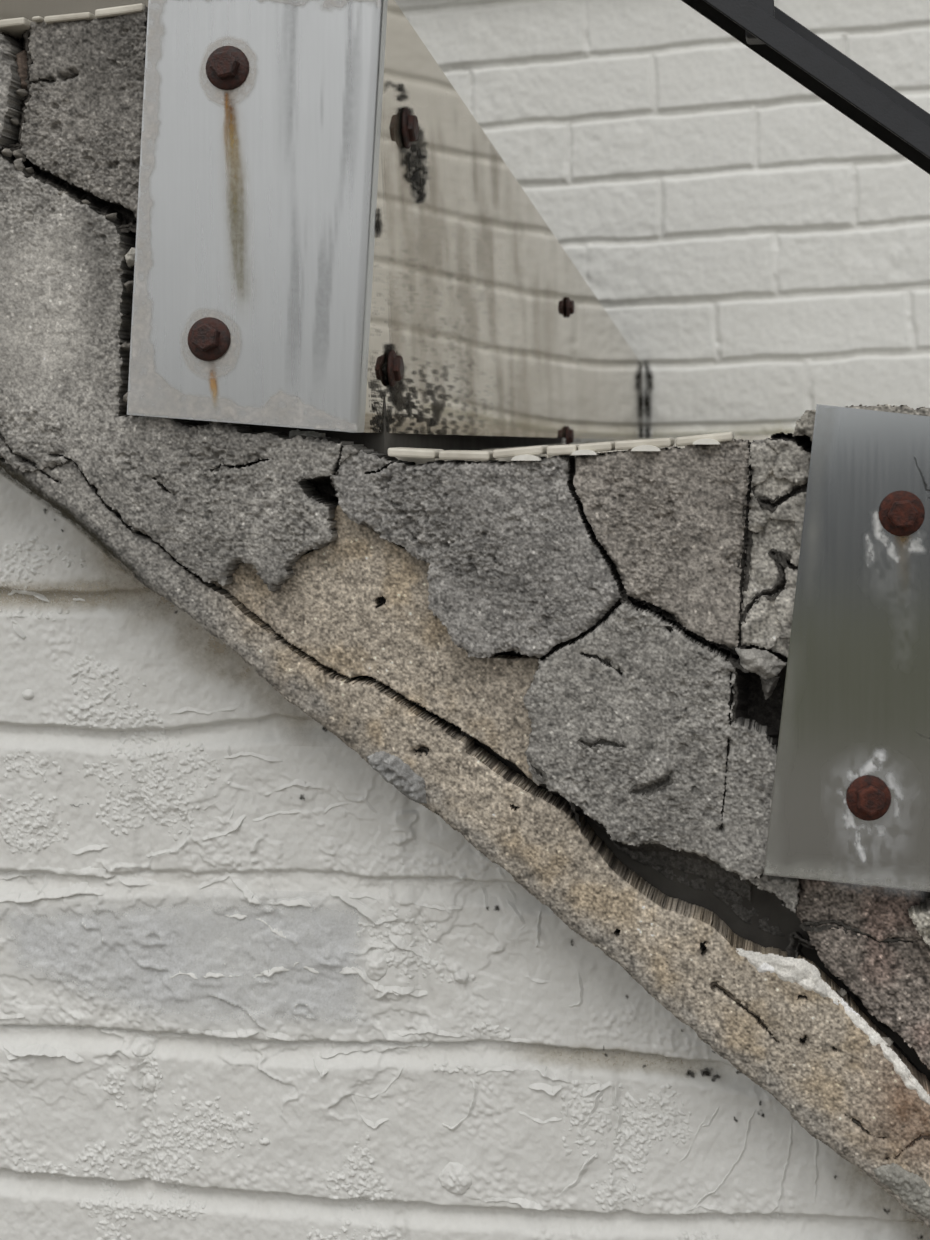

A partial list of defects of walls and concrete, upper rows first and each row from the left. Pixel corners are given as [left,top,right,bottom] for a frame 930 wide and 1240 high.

crack [0,30,137,238]
rust [225,93,238,237]
spalling [213,476,539,786]
crack [543,440,808,830]
crack [411,700,581,827]
peeling [0,844,159,907]
peeling [0,1041,84,1063]
peeling [169,1028,296,1041]
peeling [168,889,428,1000]
peeling [312,1026,535,1078]
crack [710,982,780,1043]
crack [785,920,927,1073]